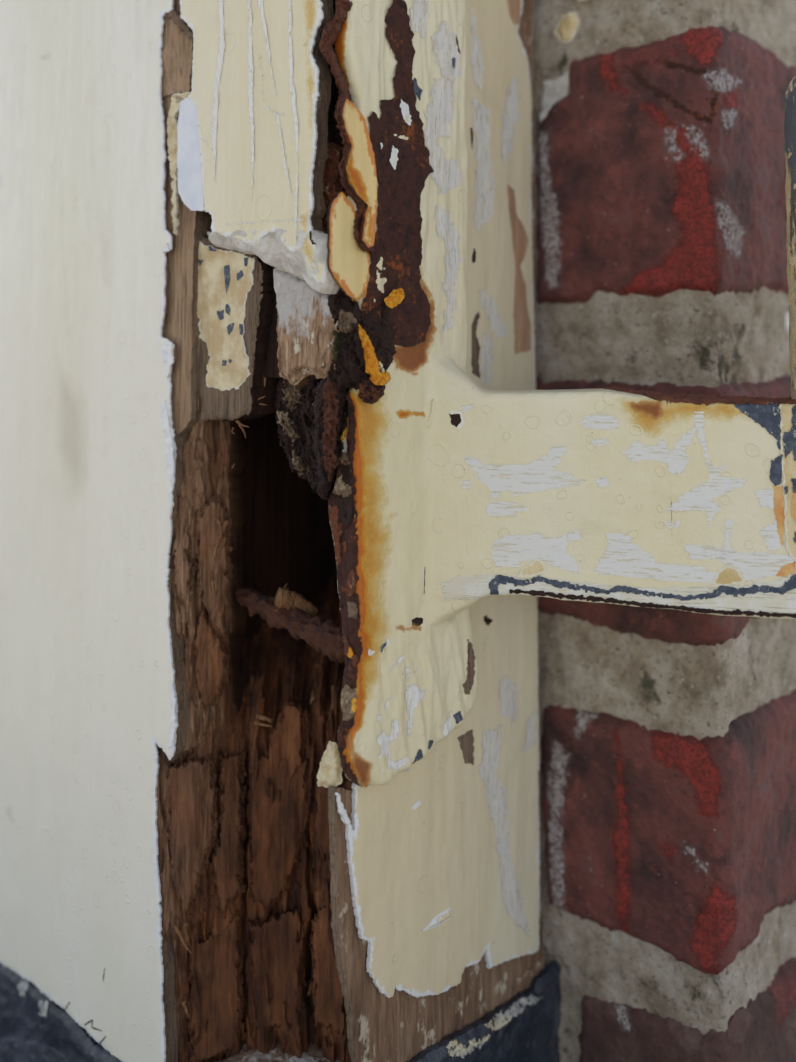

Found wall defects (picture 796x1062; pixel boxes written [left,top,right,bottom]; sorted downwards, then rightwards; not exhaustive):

peeling [161,10,205,253]
spalling [196,99,377,500]
peeling [161,344,174,379]
peeling [160,400,175,484]
rust [308,0,436,788]
peeling [448,410,465,429]
rust [587,386,796,431]
spalling [274,587,318,617]
peeling [489,574,796,601]
peeling [167,684,177,749]